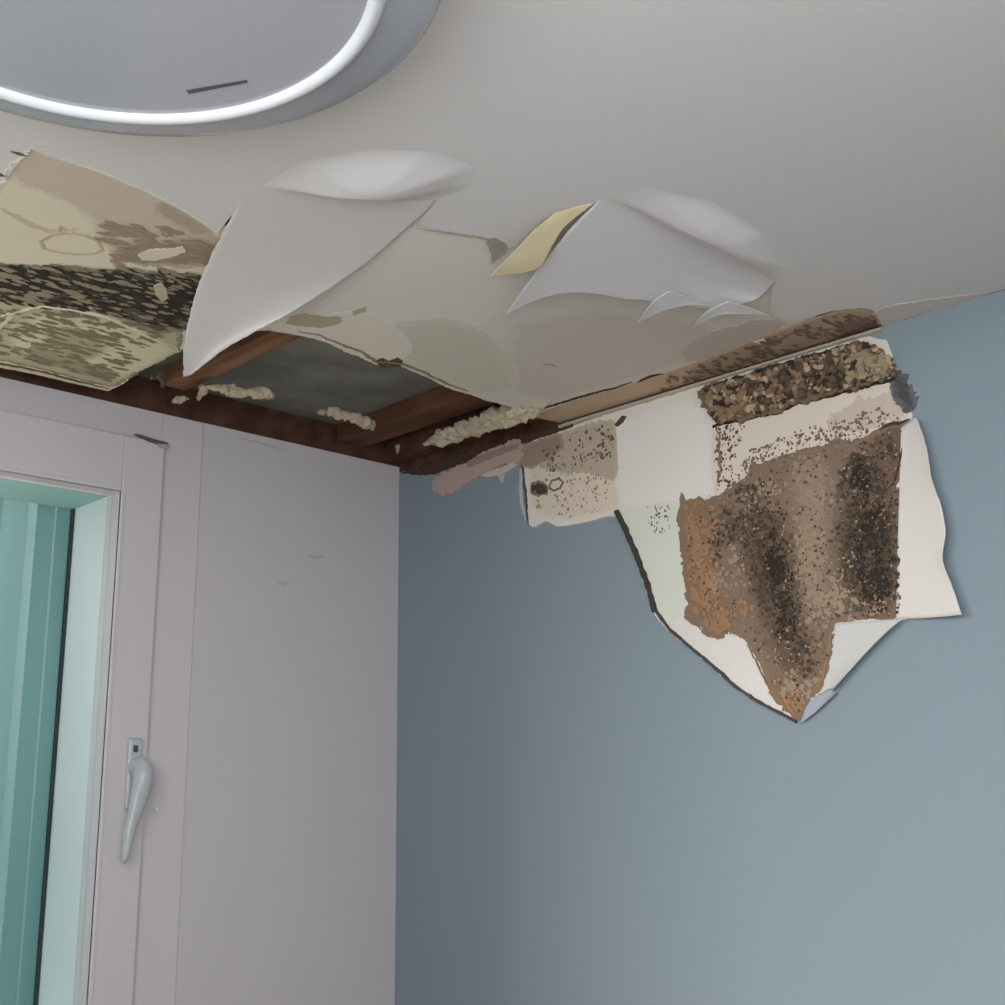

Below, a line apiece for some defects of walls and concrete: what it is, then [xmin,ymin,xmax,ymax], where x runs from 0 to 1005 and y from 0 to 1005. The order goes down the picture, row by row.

water stain [0,149,222,387]
peeling [154,283,168,302]
peeling [138,246,186,261]
spalling [268,311,468,392]
water stain [286,223,983,400]
flaking render [533,336,897,500]
water stain [466,419,618,518]
flaking render [521,468,632,528]
flaking render [653,612,791,717]